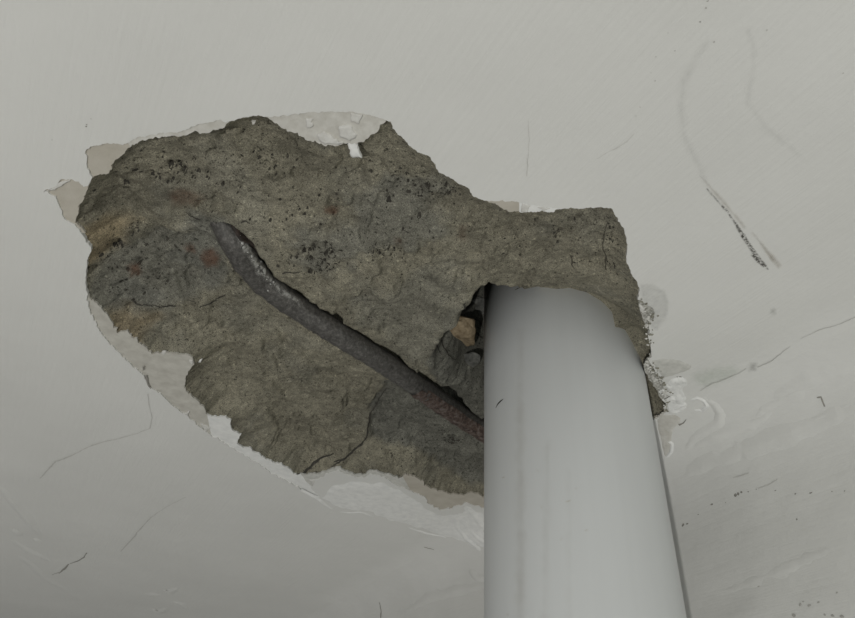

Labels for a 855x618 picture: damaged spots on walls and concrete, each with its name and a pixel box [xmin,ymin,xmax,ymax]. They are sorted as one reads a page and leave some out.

spalling [46,111,674,509]
crack [700,317,855,391]
crack [40,367,152,478]